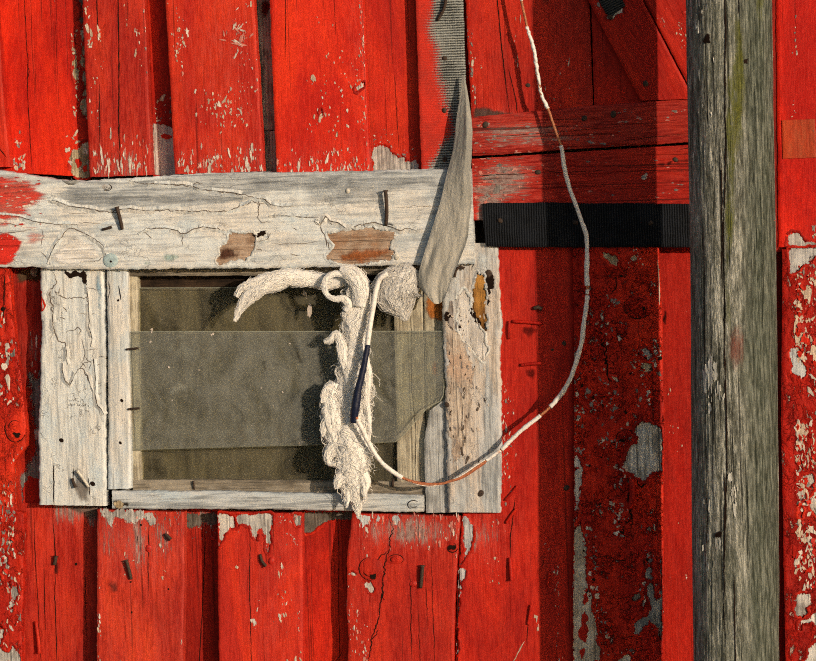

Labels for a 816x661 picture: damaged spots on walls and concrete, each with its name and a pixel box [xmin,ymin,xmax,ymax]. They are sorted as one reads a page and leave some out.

peeling [69,0,101,119]
peeling [194,1,258,134]
peeling [307,4,366,137]
peeling [62,191,137,204]
crack [0,0,424,416]
peeling [214,229,258,267]
peeling [65,94,422,200]
peeling [598,249,643,268]
peeling [0,340,16,405]
peeling [629,345,662,407]
peeling [571,369,679,661]
crack [368,517,394,661]